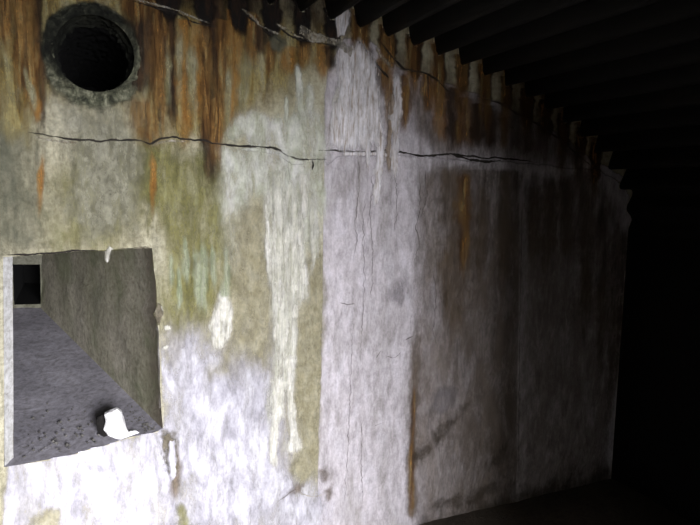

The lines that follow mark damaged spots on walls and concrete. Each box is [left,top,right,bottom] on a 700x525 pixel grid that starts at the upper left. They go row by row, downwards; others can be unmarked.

corrosion [0,0,341,176]
damp [166,40,196,101]
crack [357,40,452,93]
corrosion [348,7,602,190]
damp [209,291,232,348]
crack [29,132,531,501]
damp [217,10,403,466]